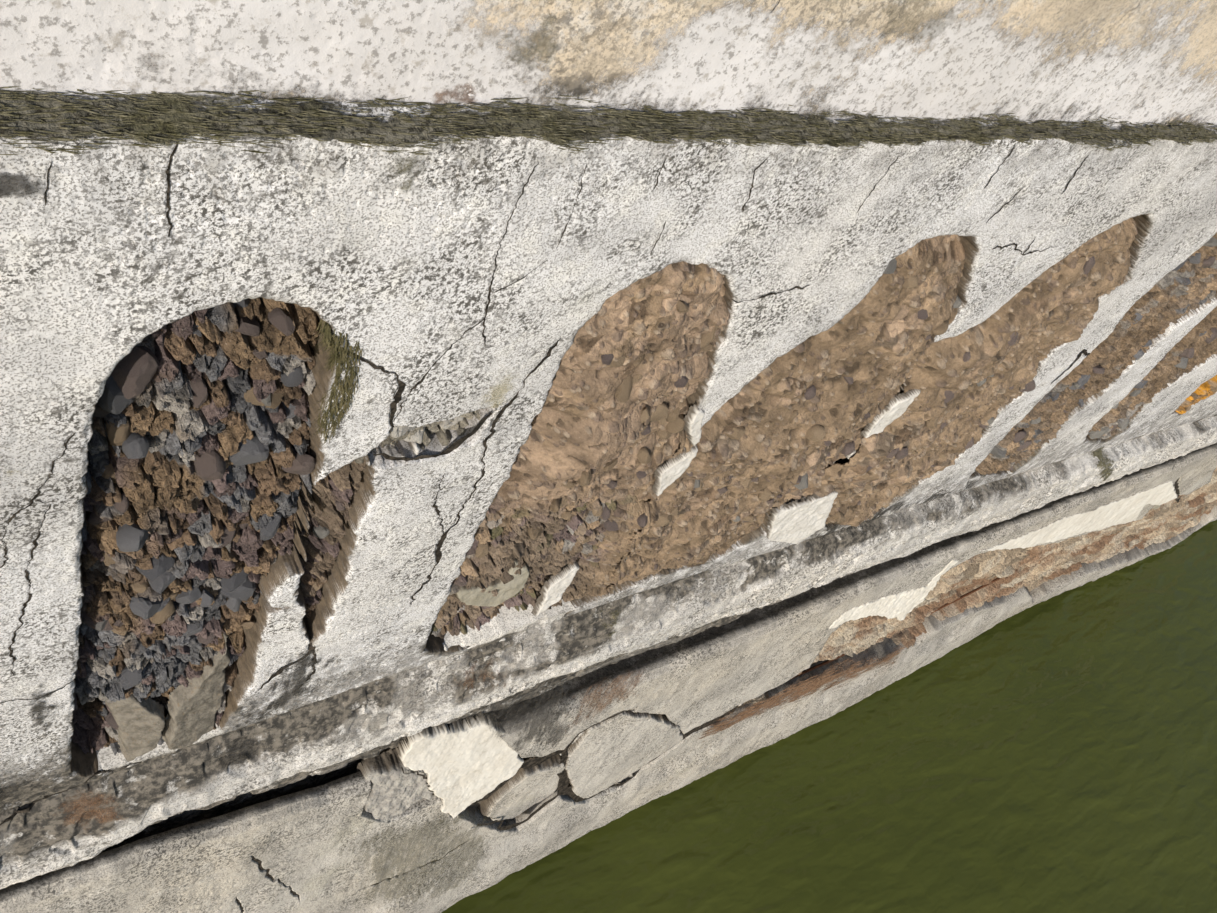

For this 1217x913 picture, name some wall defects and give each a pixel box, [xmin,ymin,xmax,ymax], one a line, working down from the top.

water stain [0,173,40,197]
water stain [396,158,415,189]
crack [340,162,587,605]
crack [0,433,75,704]
spalling [788,468,1217,681]
spalling [718,691,769,722]
corrosion [699,646,907,739]
crack [366,705,738,888]
crack [252,856,300,900]